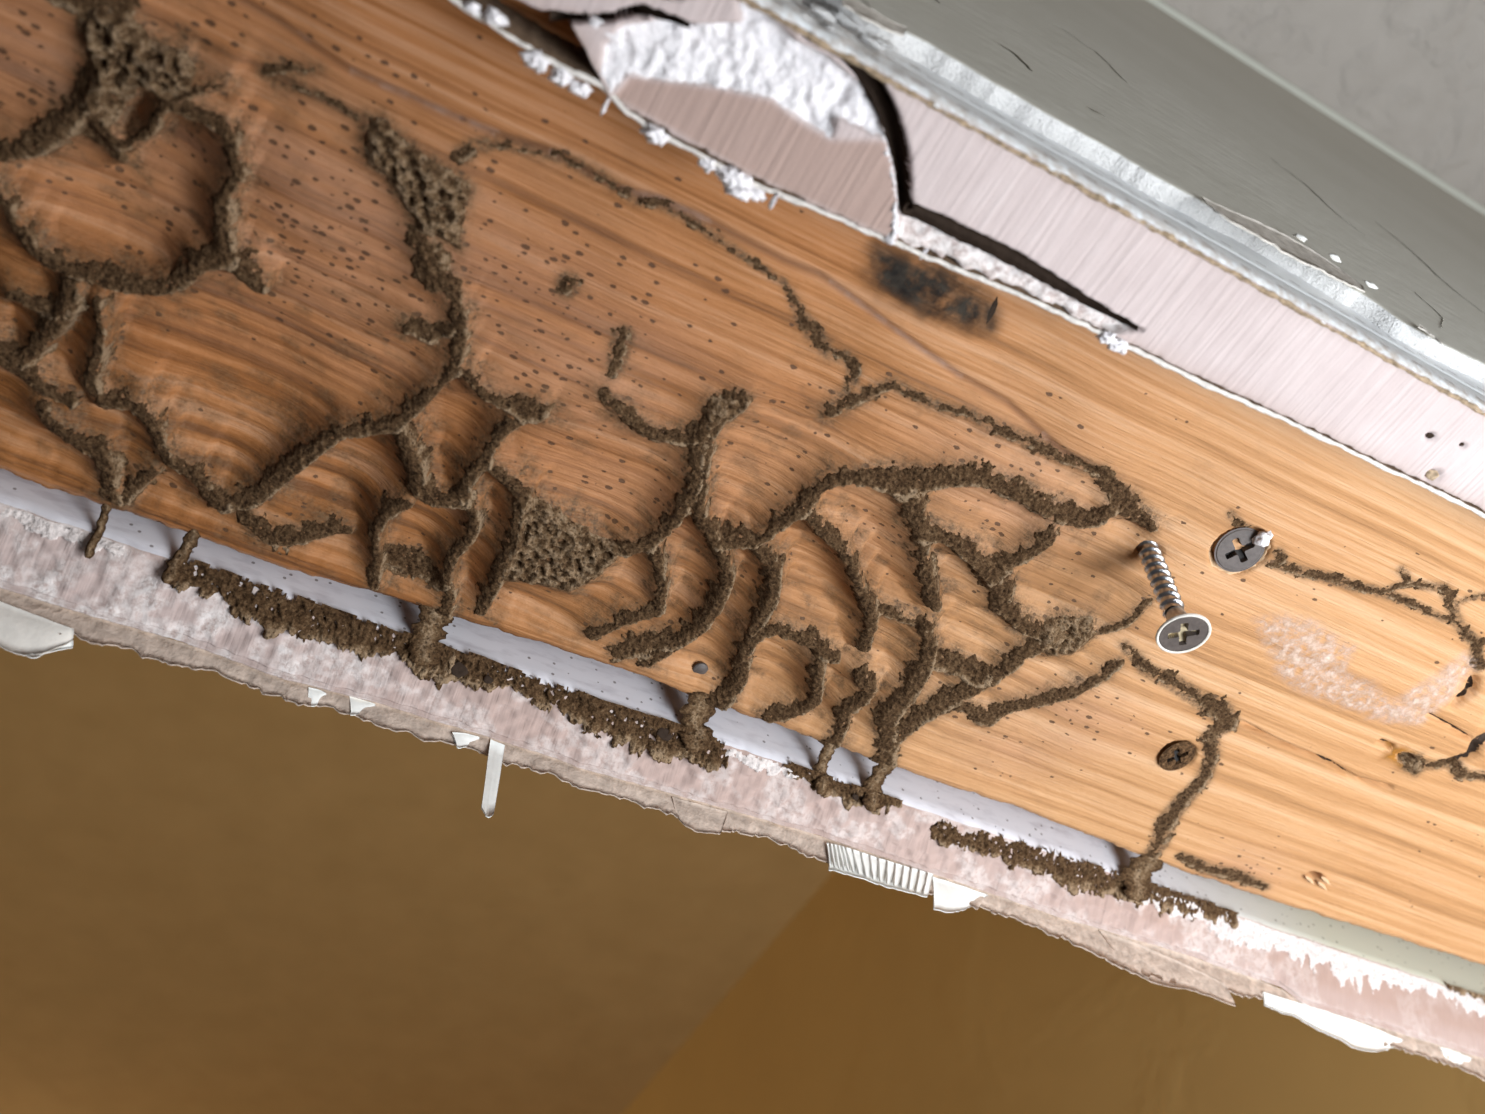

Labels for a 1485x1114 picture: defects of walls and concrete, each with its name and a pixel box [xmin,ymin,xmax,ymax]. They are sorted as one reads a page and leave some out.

peeling [587,16,625,44]
spalling [799,0,899,53]
crack [841,54,1139,331]
peeling [0,601,74,659]
crack [1429,676,1473,734]
peeling [1098,930,1236,1007]
peeling [1262,992,1403,1052]
peeling [1439,1047,1472,1066]